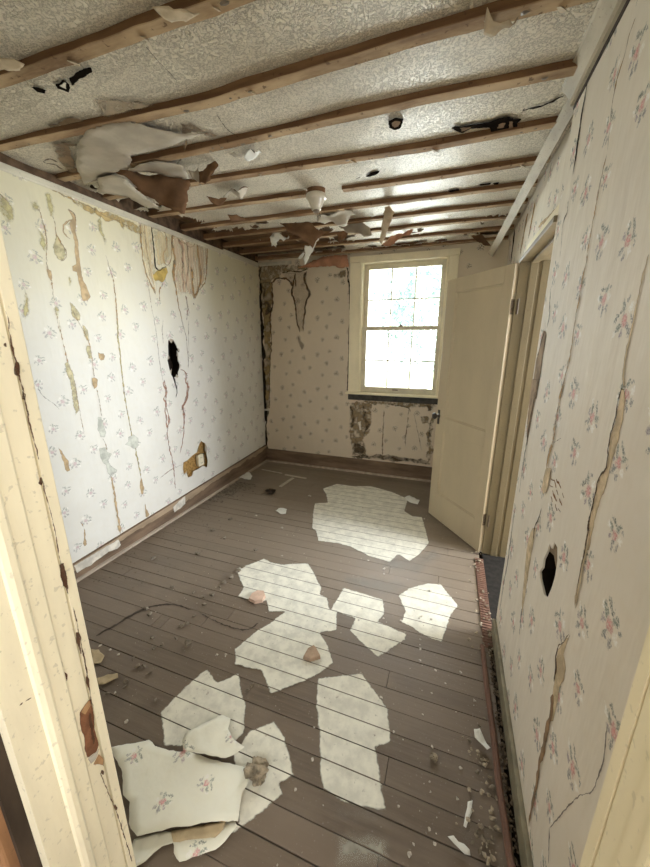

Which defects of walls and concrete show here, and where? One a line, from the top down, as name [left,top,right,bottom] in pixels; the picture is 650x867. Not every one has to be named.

damp [33,191,208,319]
damp [61,334,83,427]
damp [70,303,98,393]
damp [108,265,144,494]
spalling [167,339,180,378]
damp [98,408,121,532]
spalling [183,441,207,477]
spalling [542,544,557,597]